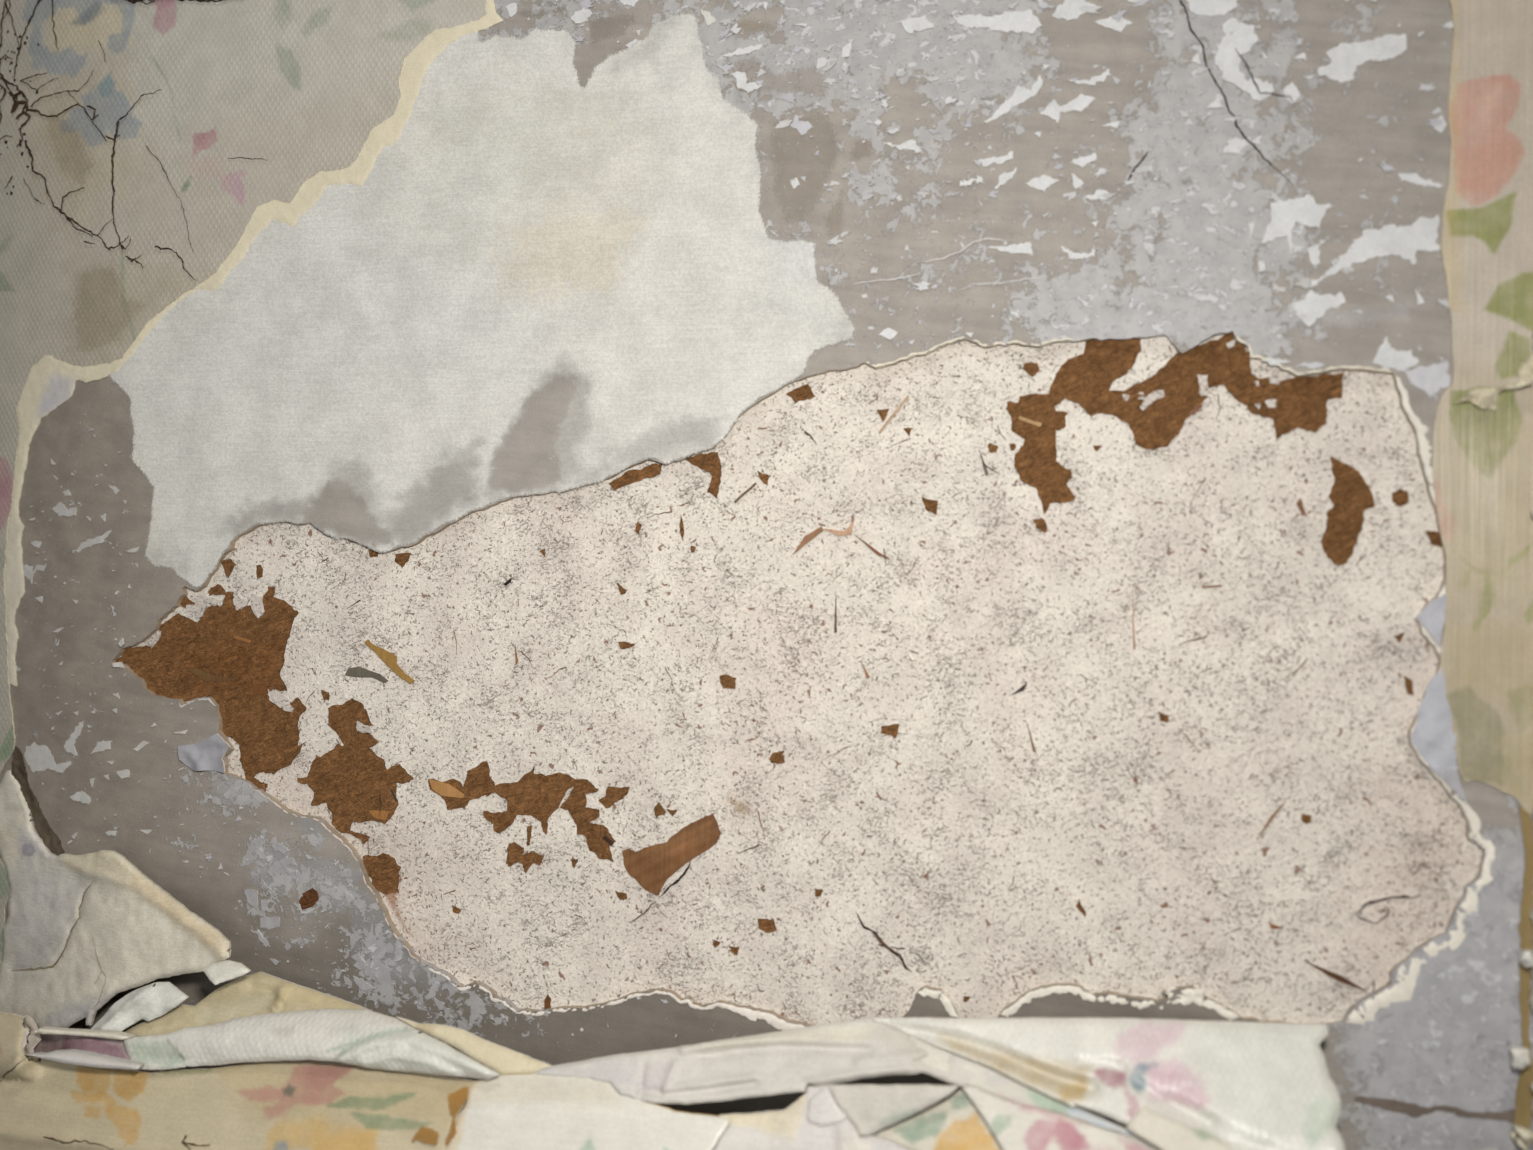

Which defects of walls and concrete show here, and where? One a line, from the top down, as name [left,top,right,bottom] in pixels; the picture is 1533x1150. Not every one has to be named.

peeling [723,44,766,93]
peeling [952,0,1138,34]
peeling [984,64,1112,137]
crack [1179,0,1293,185]
peeling [1186,0,1407,104]
peeling [979,151,1116,200]
peeling [1398,173,1443,189]
peeling [988,242,1033,255]
peeling [1248,194,1440,326]
peeling [52,490,111,553]
spalling [112,328,1495,1031]
peeling [24,693,130,804]